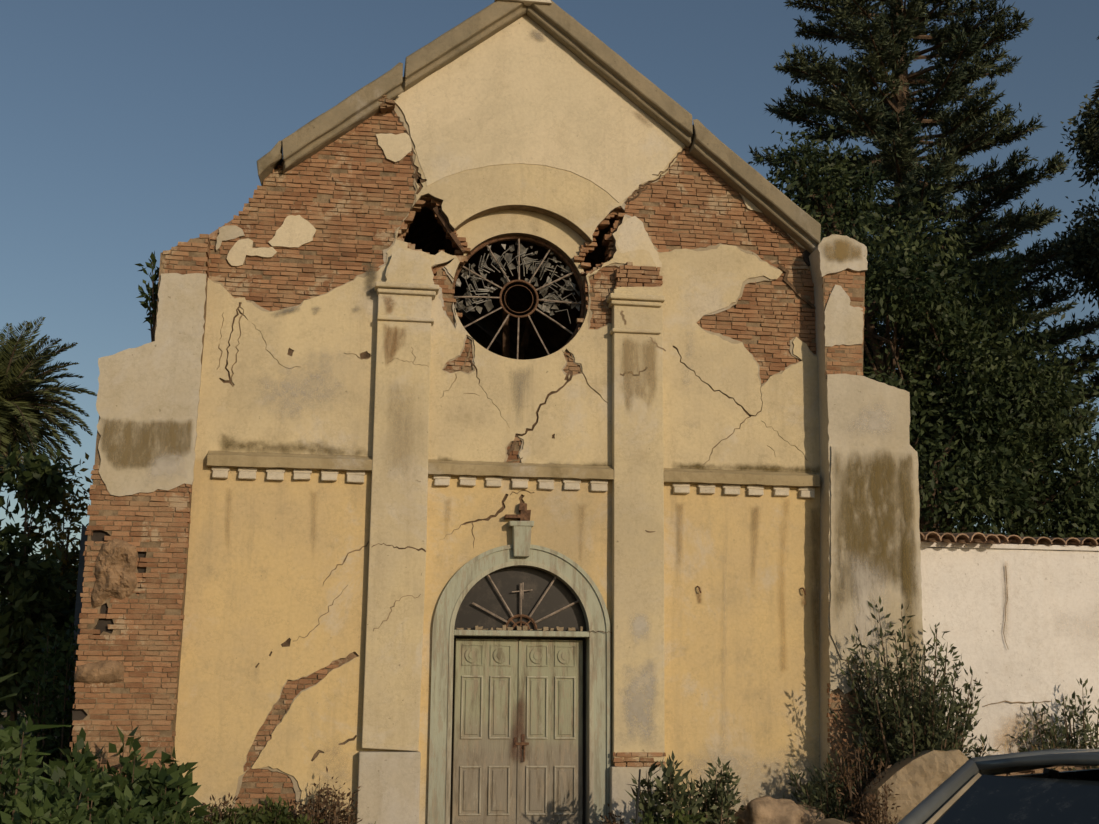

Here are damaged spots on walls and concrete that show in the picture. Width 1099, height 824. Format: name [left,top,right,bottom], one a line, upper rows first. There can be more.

flaking render [162,110,471,318]
crack [624,144,691,204]
flaking render [573,145,865,383]
crack [217,303,297,387]
spalling [443,339,473,373]
crack [442,348,606,462]
damp [624,341,654,403]
crack [620,337,802,465]
flaking render [70,465,192,777]
crack [256,490,534,668]
damp [856,566,880,643]
flaking render [235,654,358,822]